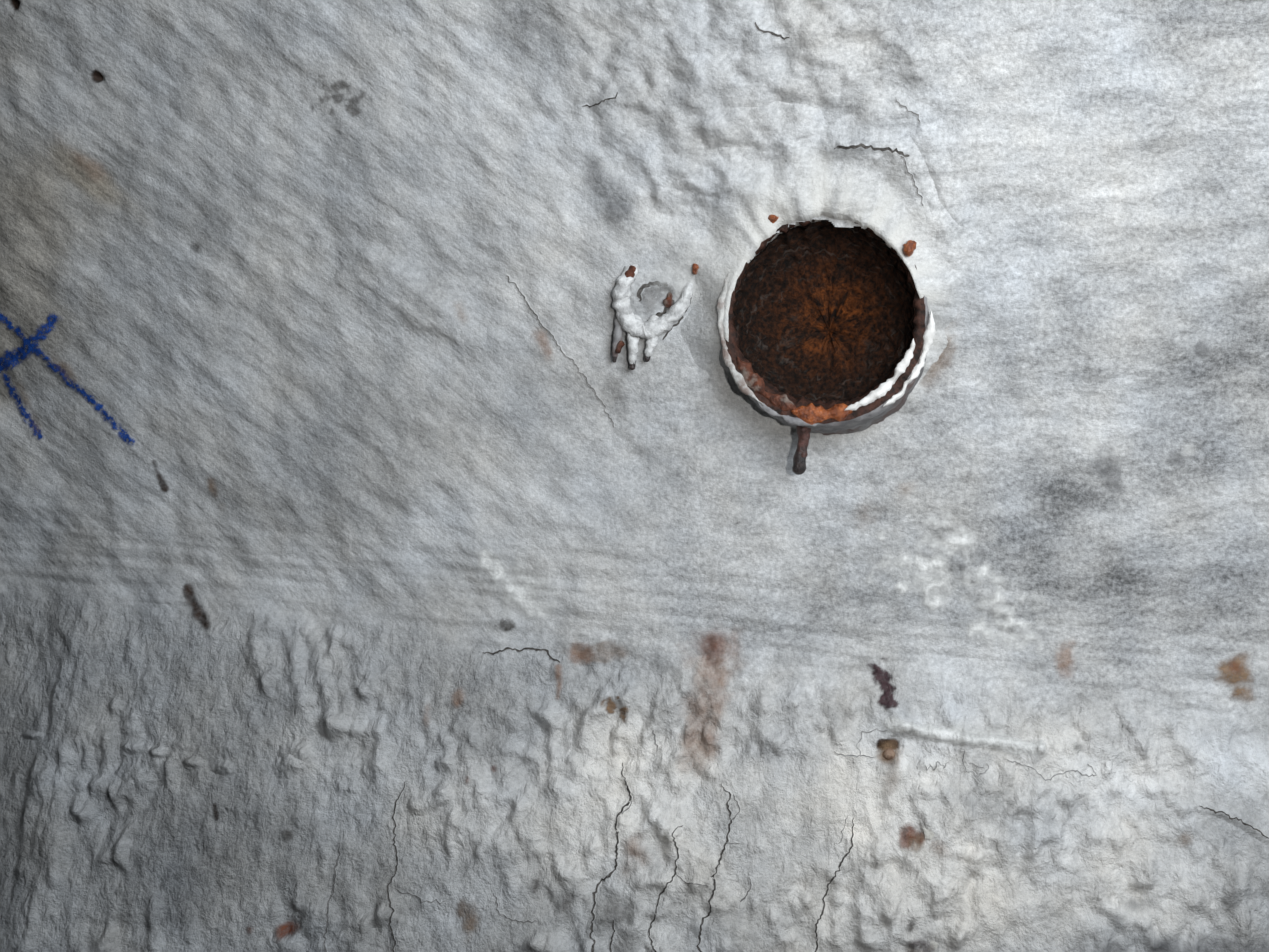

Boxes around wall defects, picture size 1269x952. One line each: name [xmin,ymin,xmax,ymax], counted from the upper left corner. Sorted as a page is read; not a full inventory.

crack [896,98,921,123]
crack [834,141,926,212]
corrosion [902,240,917,257]
corrosion [737,356,853,425]
crack [483,646,560,663]
corrosion [872,664,898,709]
corrosion [1219,656,1249,698]
corrosion [880,742,897,762]
crack [387,781,447,952]
crack [589,763,633,952]
crack [647,783,752,952]
crack [814,815,855,952]